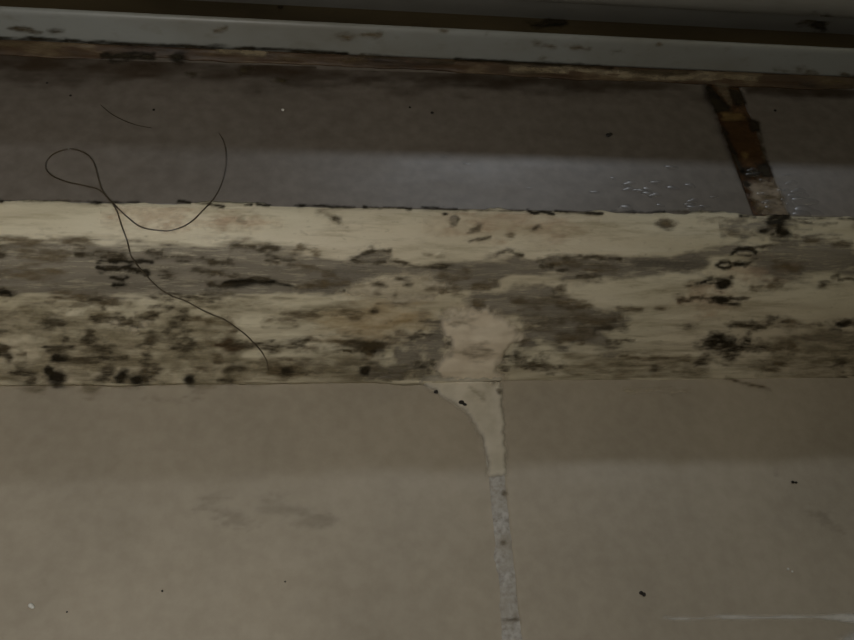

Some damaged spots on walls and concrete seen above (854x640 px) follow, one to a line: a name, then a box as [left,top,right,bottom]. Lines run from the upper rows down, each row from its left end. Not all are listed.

leakage [0,196,854,391]